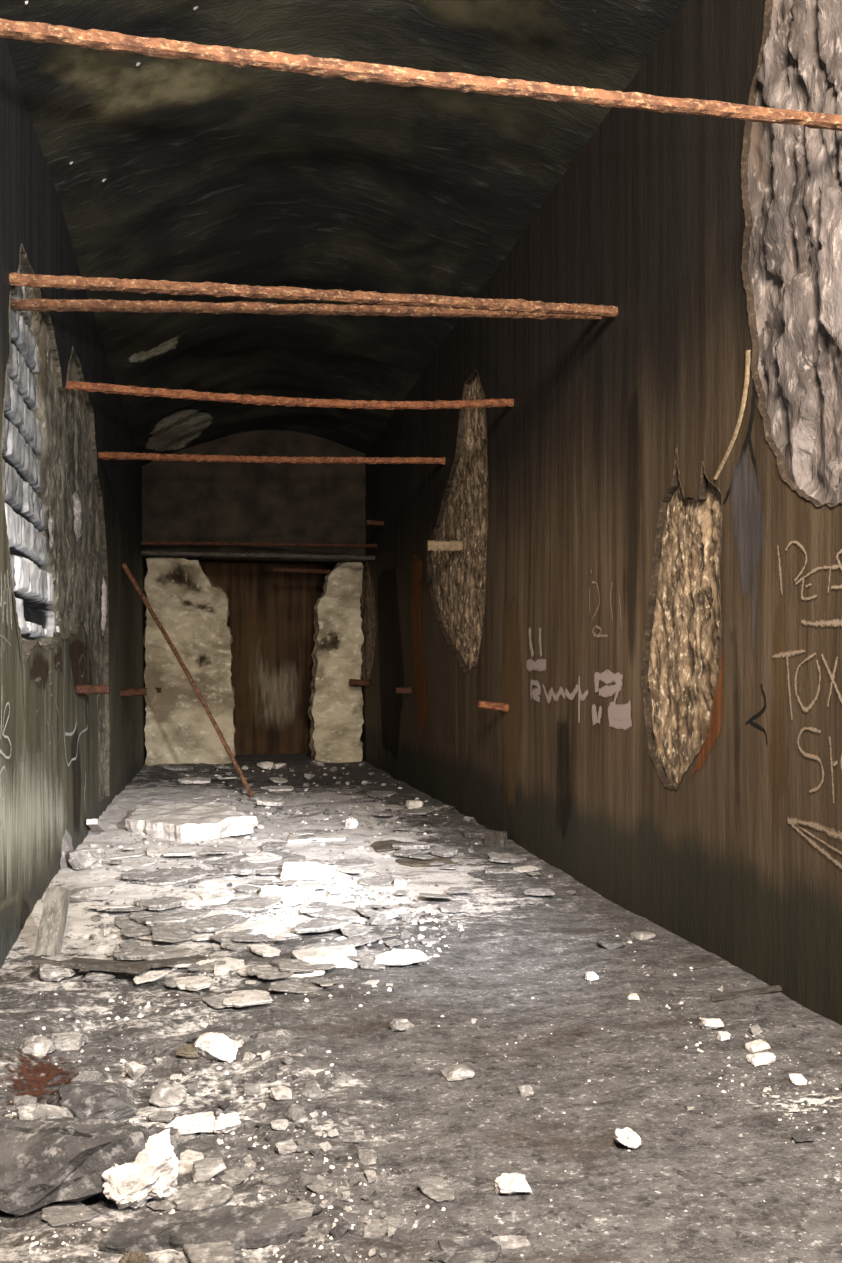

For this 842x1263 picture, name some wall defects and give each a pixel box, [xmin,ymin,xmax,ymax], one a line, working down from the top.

spalling [1,243,110,801]
spalling [426,370,488,675]
spalling [641,0,842,791]